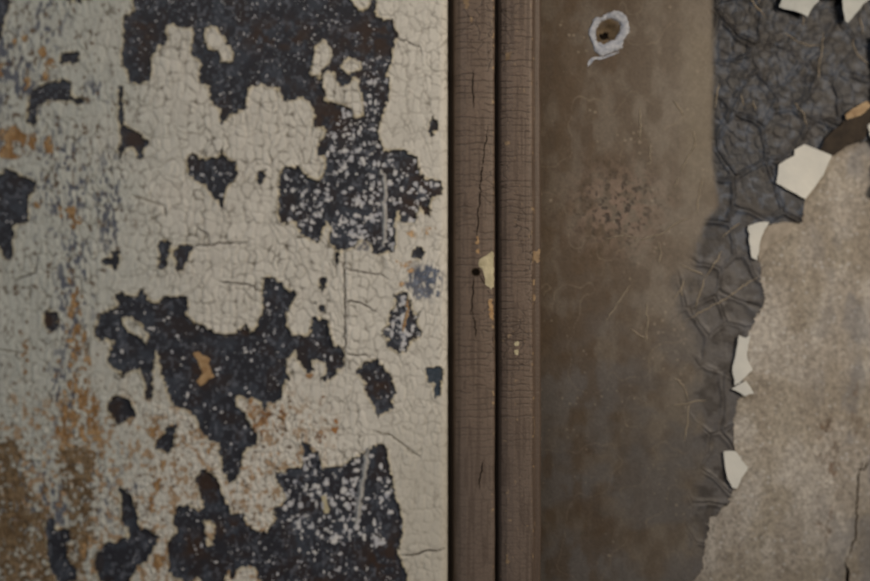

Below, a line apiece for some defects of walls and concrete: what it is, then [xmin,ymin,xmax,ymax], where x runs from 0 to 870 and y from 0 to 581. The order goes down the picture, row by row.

peeling [116,0,444,272]
peeling [0,168,37,261]
crack [186,228,246,247]
crack [342,253,388,371]
spalling [680,0,870,581]
rust [0,436,55,581]
rust [54,270,104,581]
rust [145,418,166,513]
rust [152,553,167,572]
peeling [93,276,408,581]
crack [402,548,444,556]
crack [845,461,870,581]